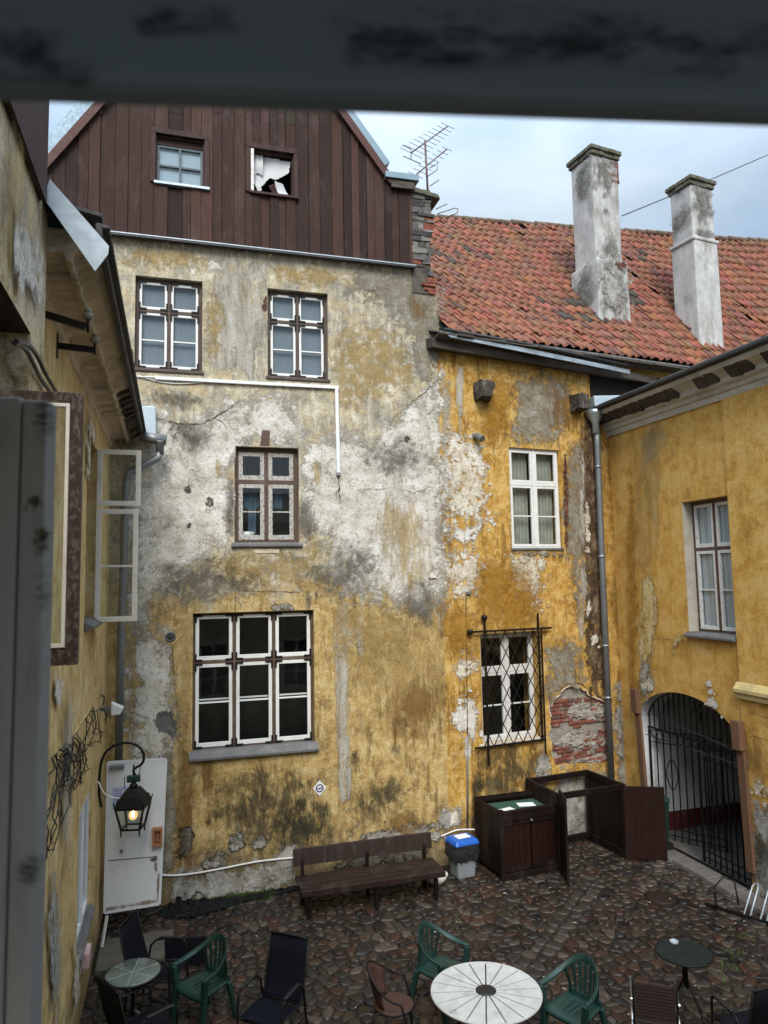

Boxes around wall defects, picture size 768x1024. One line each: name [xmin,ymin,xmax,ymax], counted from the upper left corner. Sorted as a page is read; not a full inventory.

crack [159,400,240,443]
peeling [117,265,500,760]
water stain [577,406,658,705]
peeling [638,574,658,701]
spalling [534,681,626,786]
spalling [175,826,195,861]
spalling [200,830,268,870]
mould [206,771,331,850]